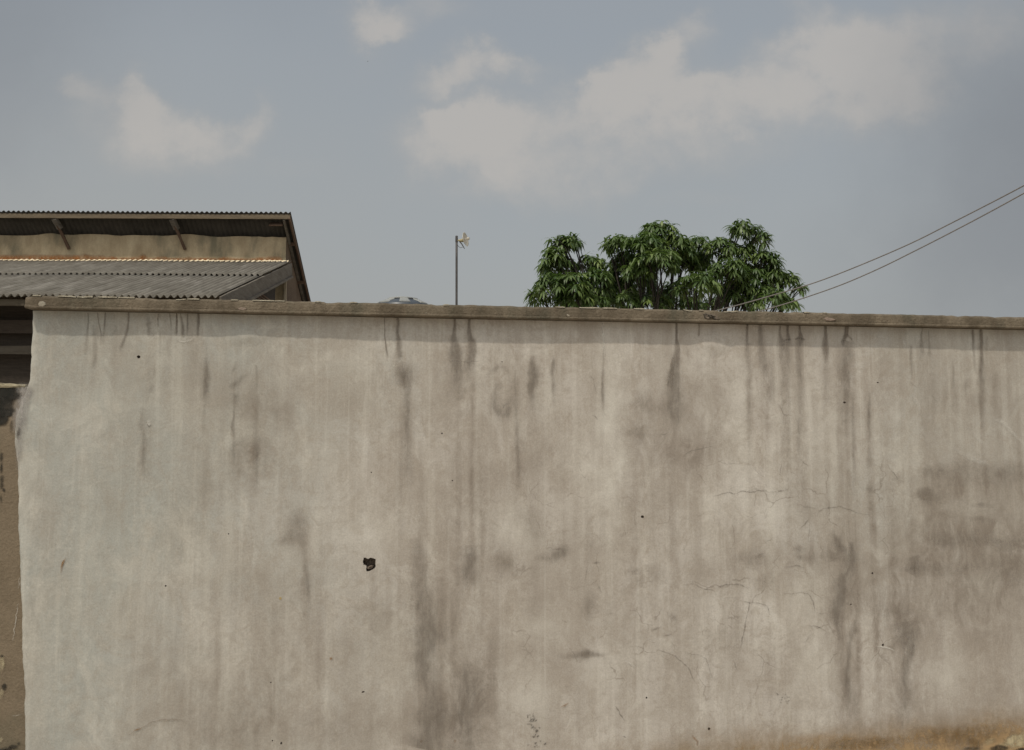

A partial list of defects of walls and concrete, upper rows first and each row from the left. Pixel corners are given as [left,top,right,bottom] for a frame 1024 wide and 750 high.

spalling [363,558,376,571]